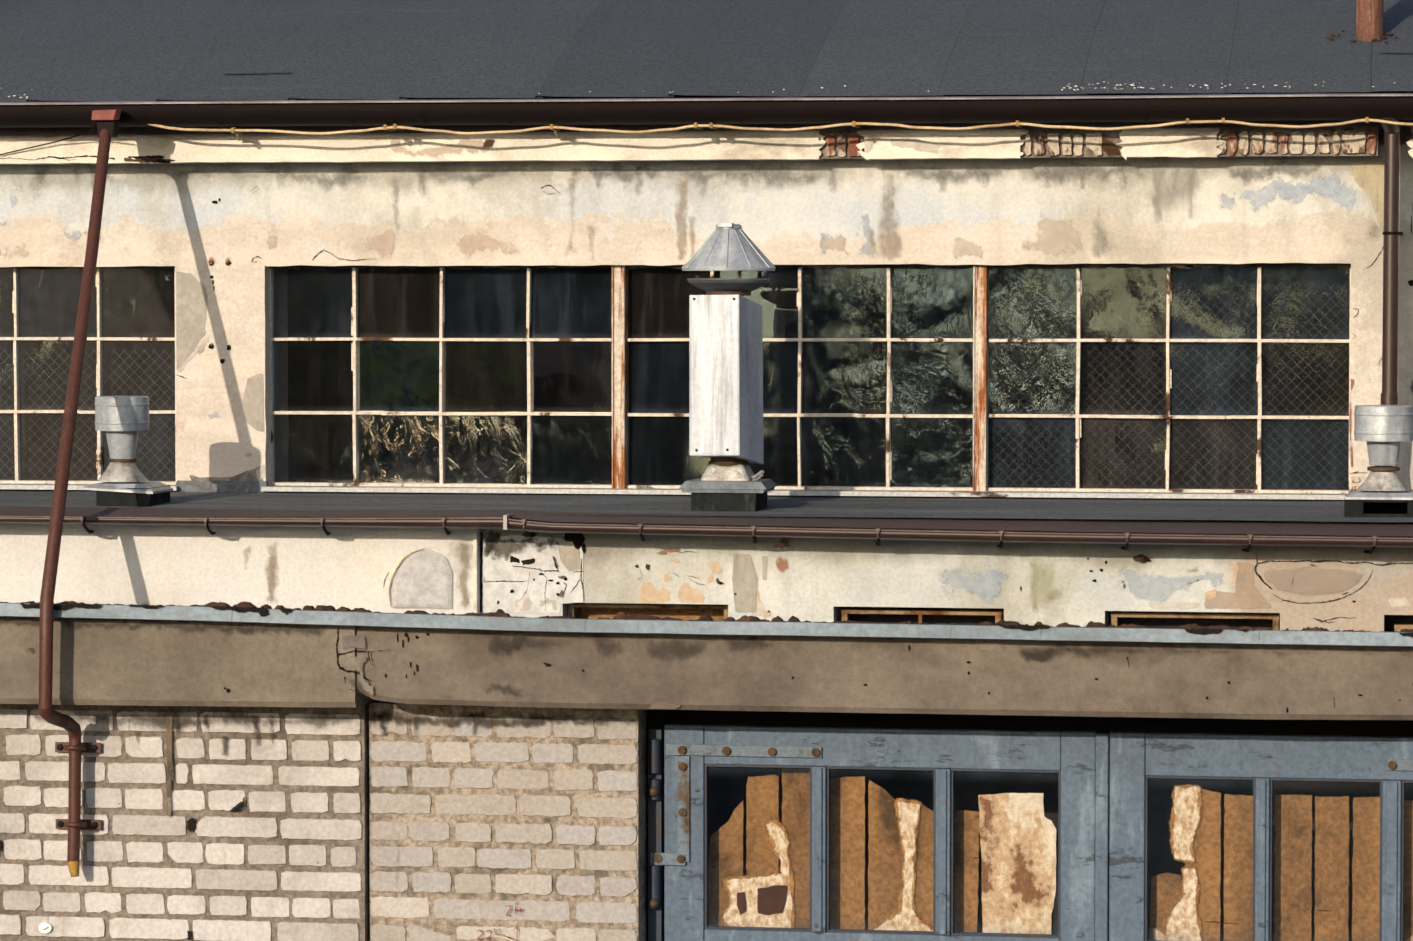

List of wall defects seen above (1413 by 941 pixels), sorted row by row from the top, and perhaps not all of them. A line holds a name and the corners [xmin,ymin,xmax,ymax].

flaking render [1024,133,1103,157]
flaking render [1218,131,1376,156]
damp [676,170,722,257]
damp [1036,165,1117,182]
damp [1232,161,1306,179]
damp [1351,162,1384,229]
rust [20,603,102,611]
rust [211,606,293,617]
peeling [480,531,586,613]
peeling [635,559,737,604]
crack [1254,554,1409,623]
crack [336,627,394,696]